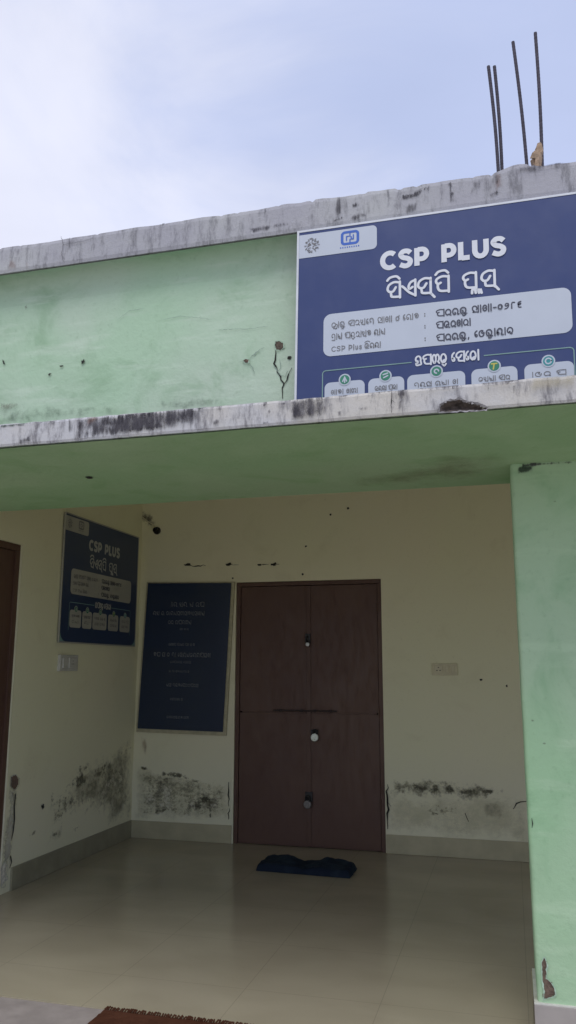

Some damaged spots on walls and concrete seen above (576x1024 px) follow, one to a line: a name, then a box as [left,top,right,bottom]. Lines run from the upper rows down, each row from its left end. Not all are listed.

crack [273,350,292,399]
damp [282,398,323,418]
spalling [438,397,488,413]
damp [69,409,200,437]
mould [396,781,492,797]
spalling [531,957,557,1013]